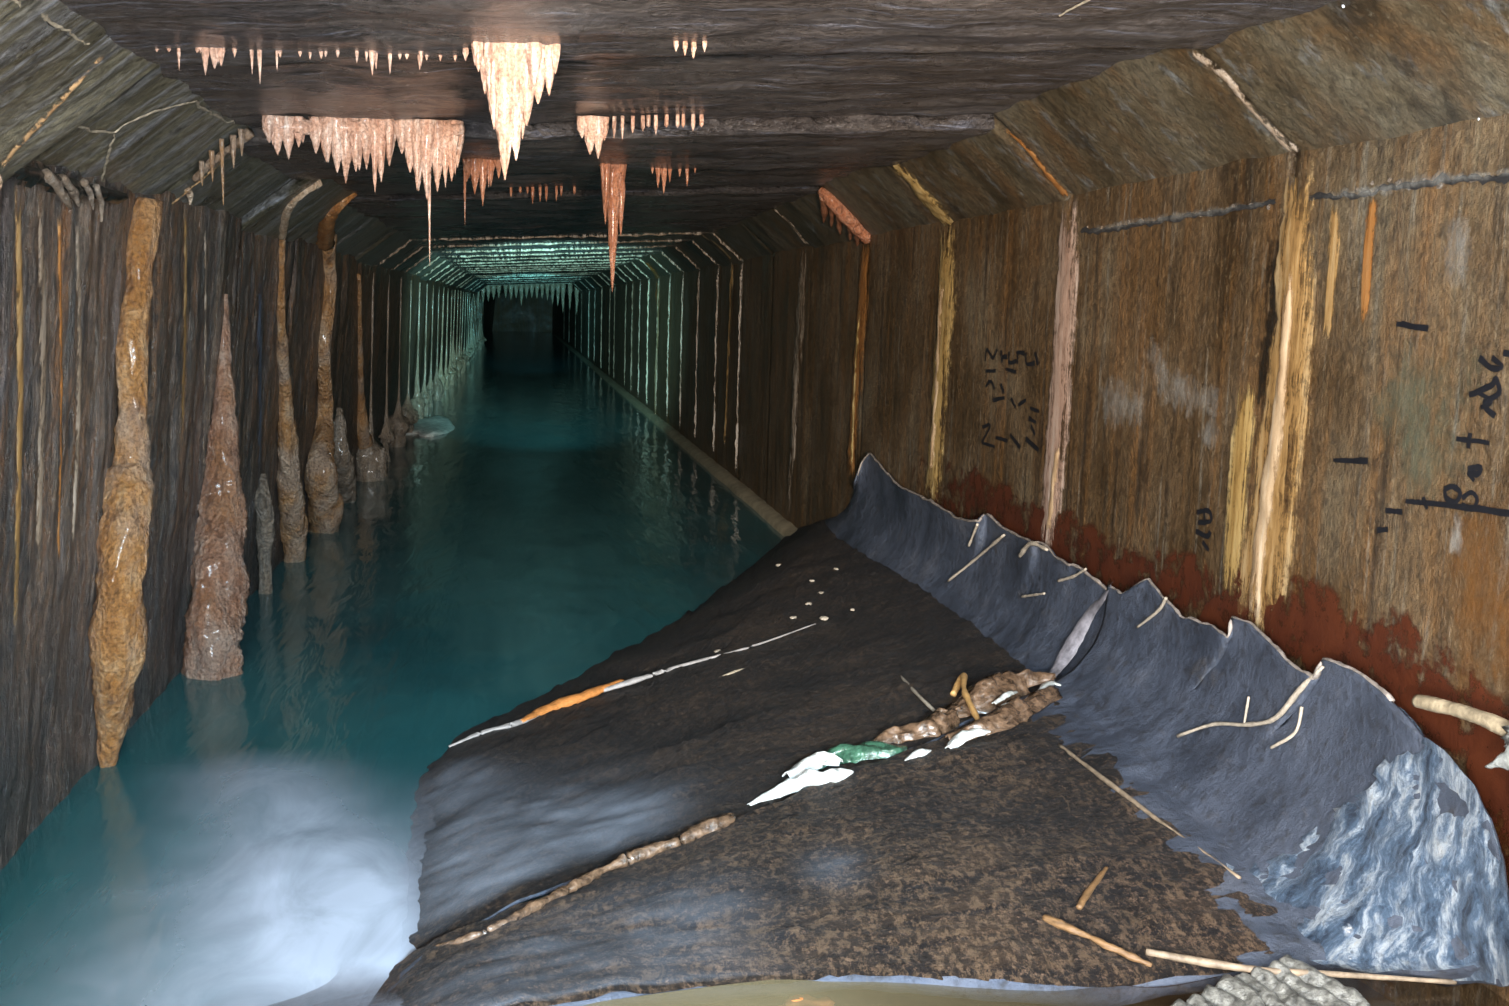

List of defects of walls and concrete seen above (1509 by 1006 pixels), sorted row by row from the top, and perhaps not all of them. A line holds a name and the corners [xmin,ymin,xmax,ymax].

damp [14,199,82,620]
damp [182,218,207,469]
crack [1081,172,1509,235]
corrosion [918,460,1509,887]